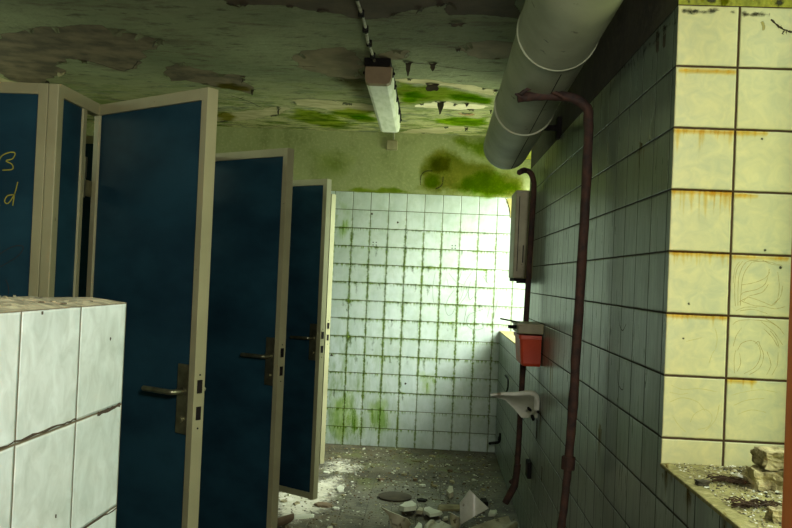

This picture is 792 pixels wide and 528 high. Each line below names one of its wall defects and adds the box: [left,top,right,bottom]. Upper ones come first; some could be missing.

peeling [0,24,164,84]
peeling [163,62,256,95]
peeling [395,62,499,96]
peeling [217,99,375,123]
peeling [415,101,492,116]
peeling [400,126,468,134]